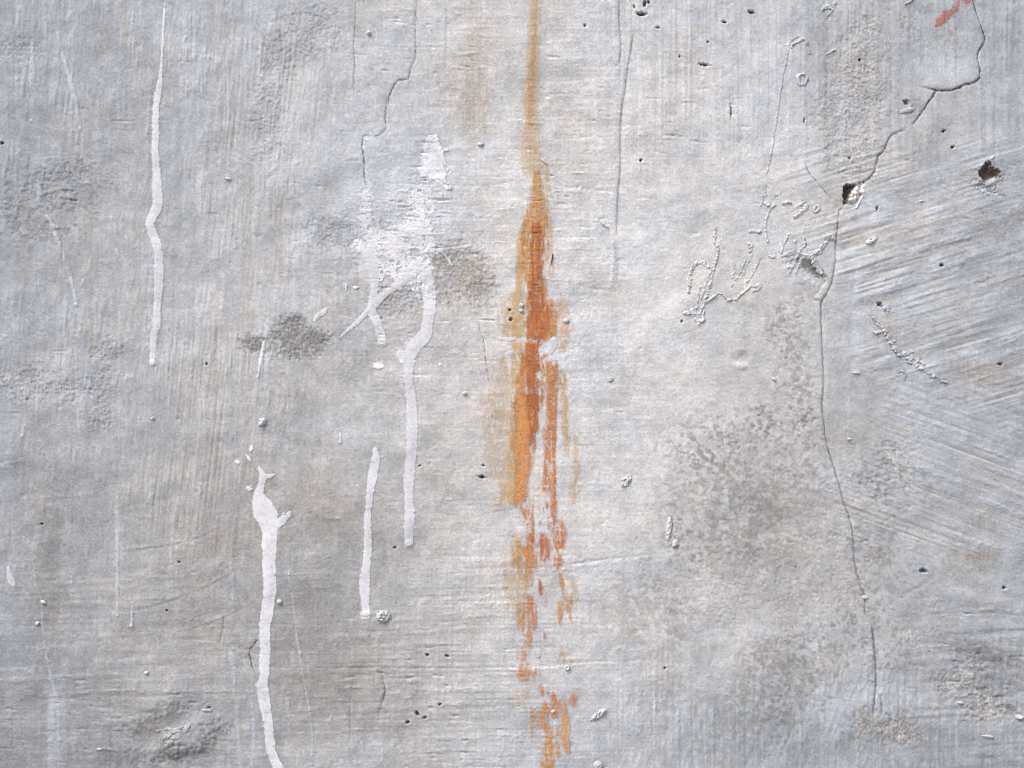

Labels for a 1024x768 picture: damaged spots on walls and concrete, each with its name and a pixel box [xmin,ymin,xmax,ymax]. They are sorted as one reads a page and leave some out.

crack [862,0,986,183]
hole [842,179,867,208]
spalling [974,155,1004,197]
corrosion [499,7,572,679]
corrosion [530,686,577,768]